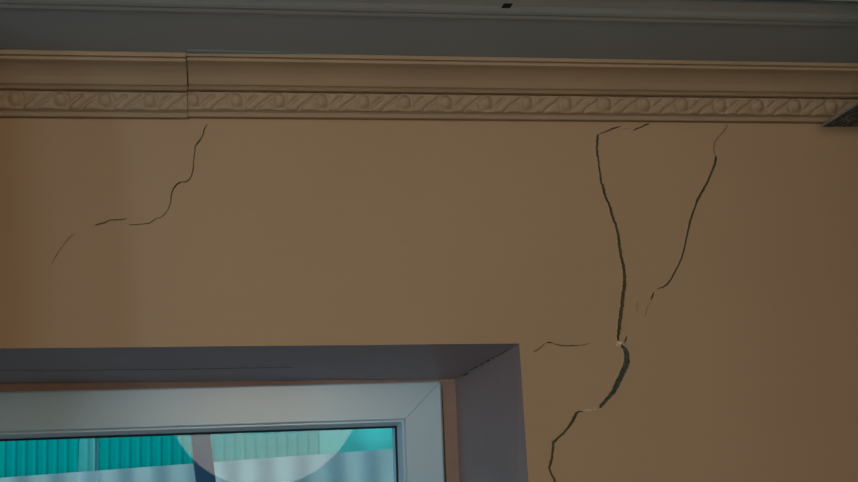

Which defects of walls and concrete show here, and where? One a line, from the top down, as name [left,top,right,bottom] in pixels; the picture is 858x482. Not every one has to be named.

crack [96,125,207,225]
crack [651,156,717,300]
crack [548,122,655,482]